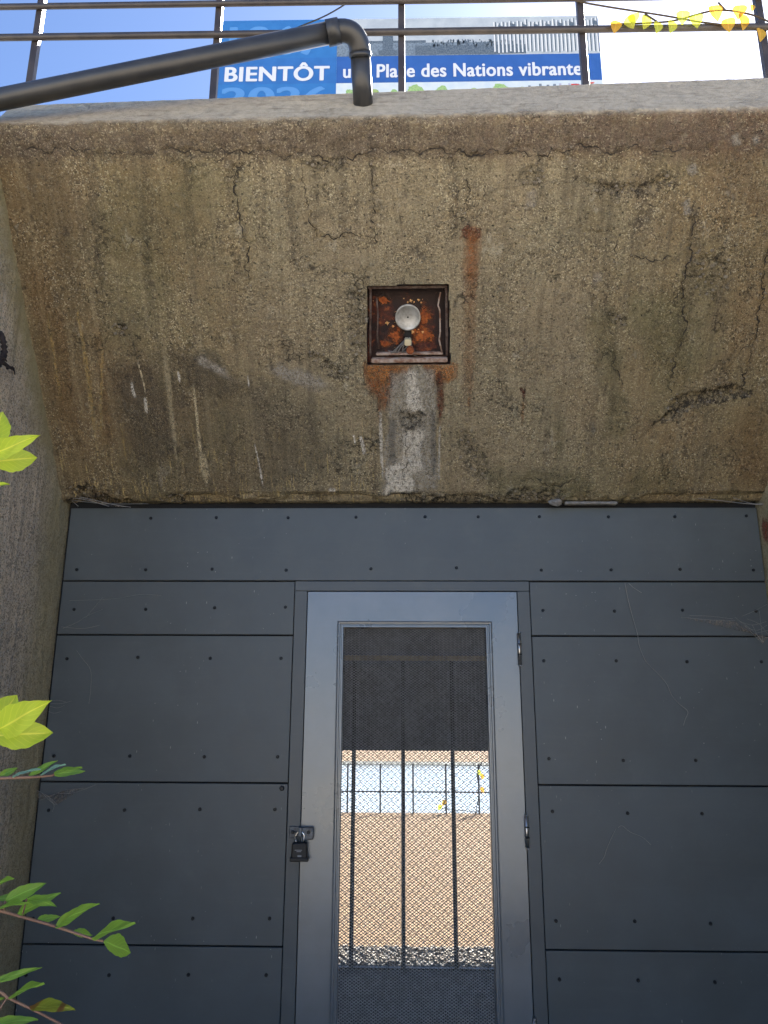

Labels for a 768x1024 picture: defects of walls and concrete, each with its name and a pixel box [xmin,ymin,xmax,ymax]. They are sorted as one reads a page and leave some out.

crack [19,143,709,287]
rust [461,224,481,281]
rust [380,299,434,347]
rust [364,365,411,417]
rust [424,363,457,417]
water stain [379,369,441,496]